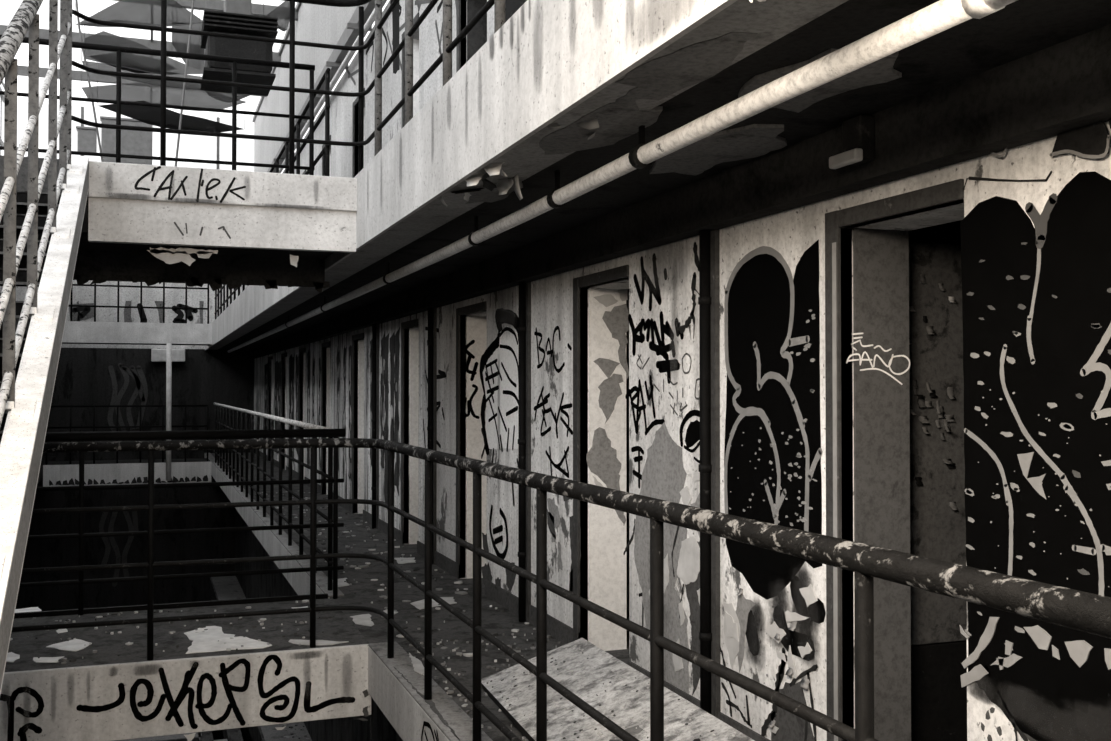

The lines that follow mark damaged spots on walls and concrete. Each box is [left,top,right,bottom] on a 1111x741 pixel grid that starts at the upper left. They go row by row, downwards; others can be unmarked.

peeling [1050,119,1111,159]
peeling [1038,403,1074,458]
peeling [949,489,975,523]
peeling [992,432,1067,516]
peeling [723,588,756,673]
peeling [765,584,818,741]
peeling [960,611,1111,688]